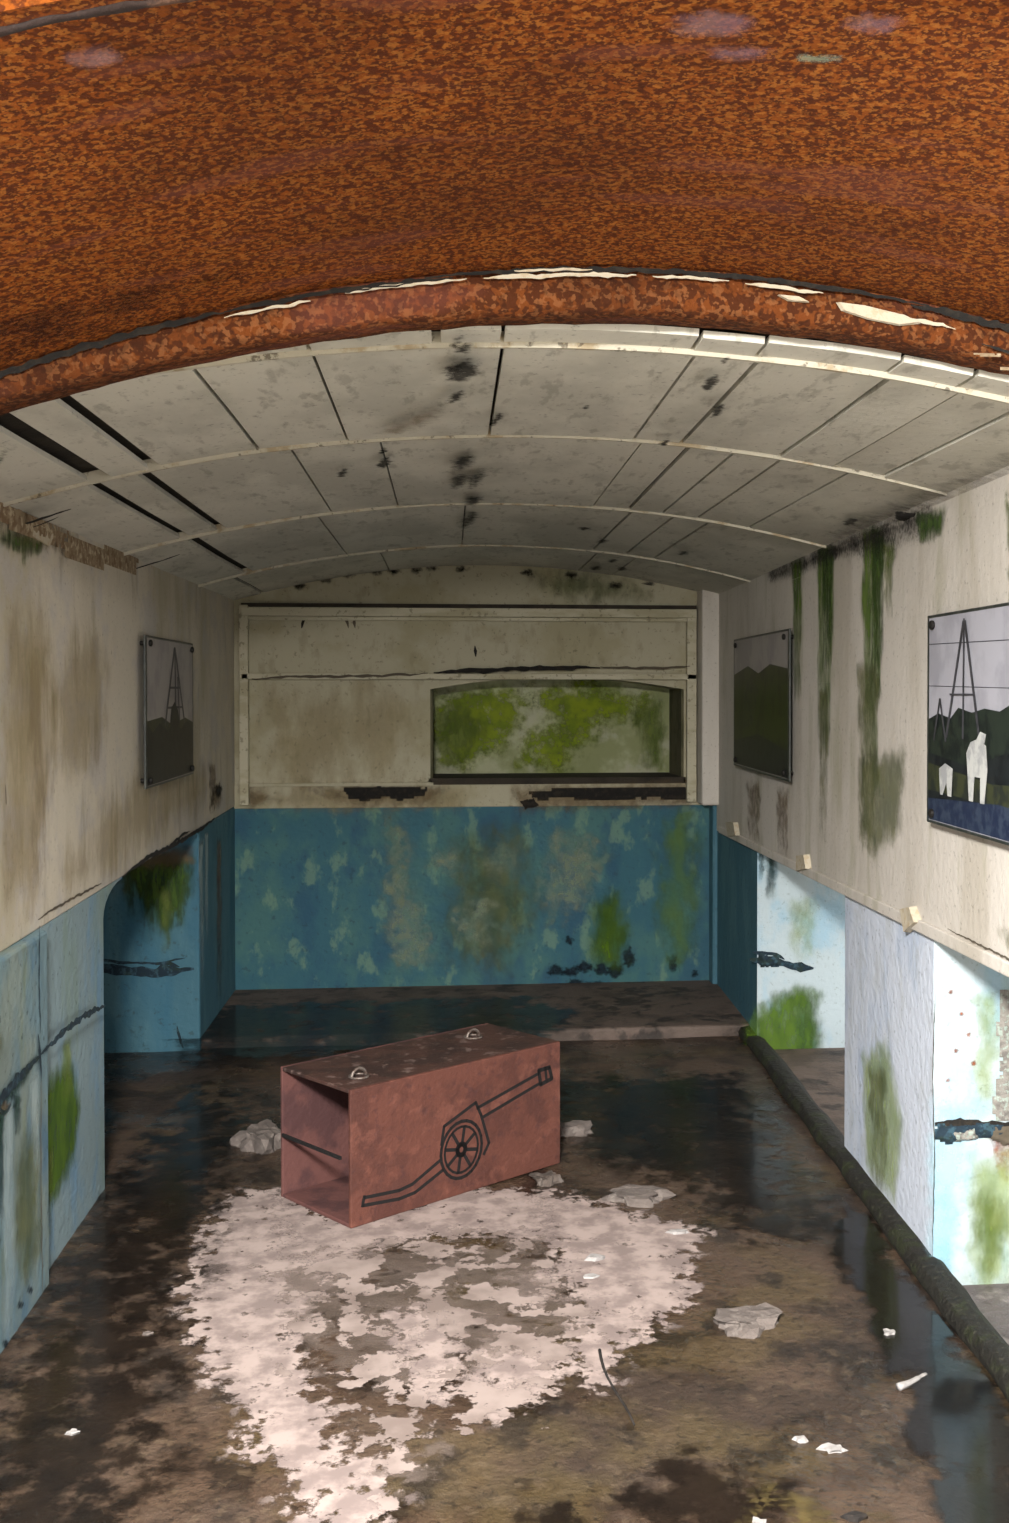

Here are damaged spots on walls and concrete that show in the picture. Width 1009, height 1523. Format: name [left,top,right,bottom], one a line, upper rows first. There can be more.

peeling [224,300,311,318]
peeling [349,268,955,329]
peeling [974,353,1009,370]
leakage [769,469,1009,764]
leakage [548,946,635,983]
leakage [175,995,577,1061]
peeling [992,990,1009,1121]
leakage [0,1080,261,1523]
leakage [515,1502,582,1523]
leakage [614,1447,797,1523]